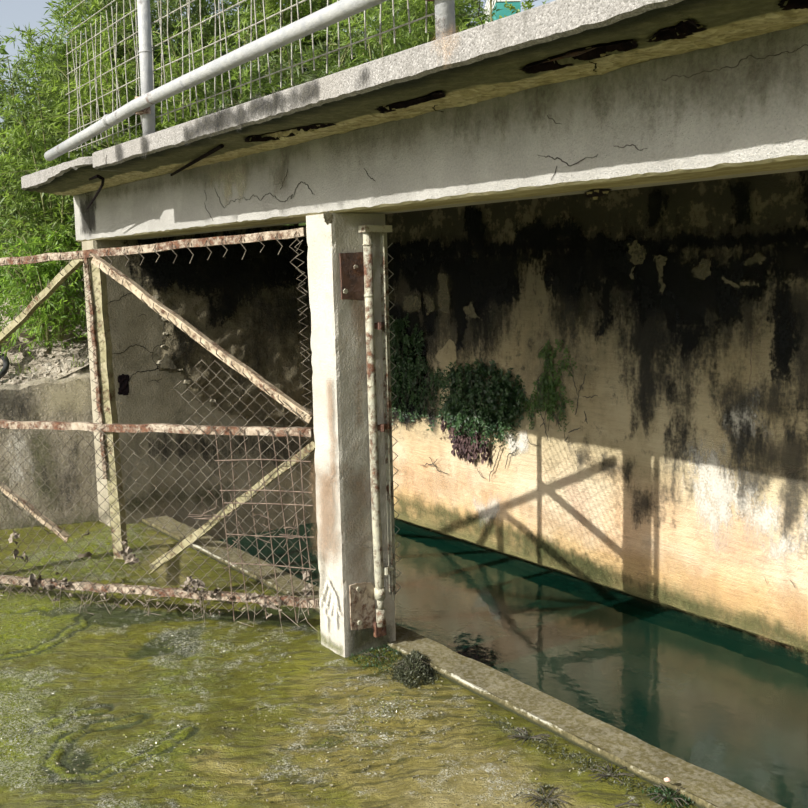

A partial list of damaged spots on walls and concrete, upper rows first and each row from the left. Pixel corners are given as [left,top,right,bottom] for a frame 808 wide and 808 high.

spalling [777,0,808,10]
spalling [519,20,708,74]
crack [661,45,808,81]
spalling [376,90,446,114]
crack [538,144,647,180]
crack [204,169,315,218]
crack [113,344,162,382]
water stain [387,172,808,559]